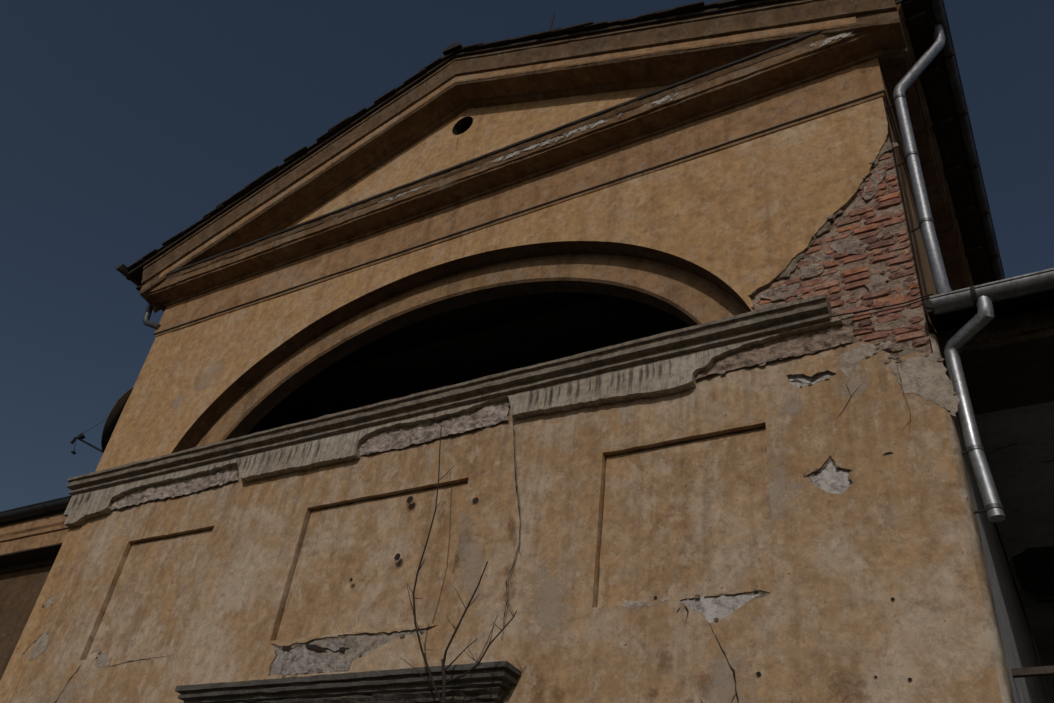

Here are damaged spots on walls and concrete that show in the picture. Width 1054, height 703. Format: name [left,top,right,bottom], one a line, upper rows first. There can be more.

spalling [695,133,960,416]
spalling [112,466,238,510]
spalling [803,457,853,495]
spalling [680,588,770,623]
spalling [269,627,434,677]
crack [676,605,739,703]